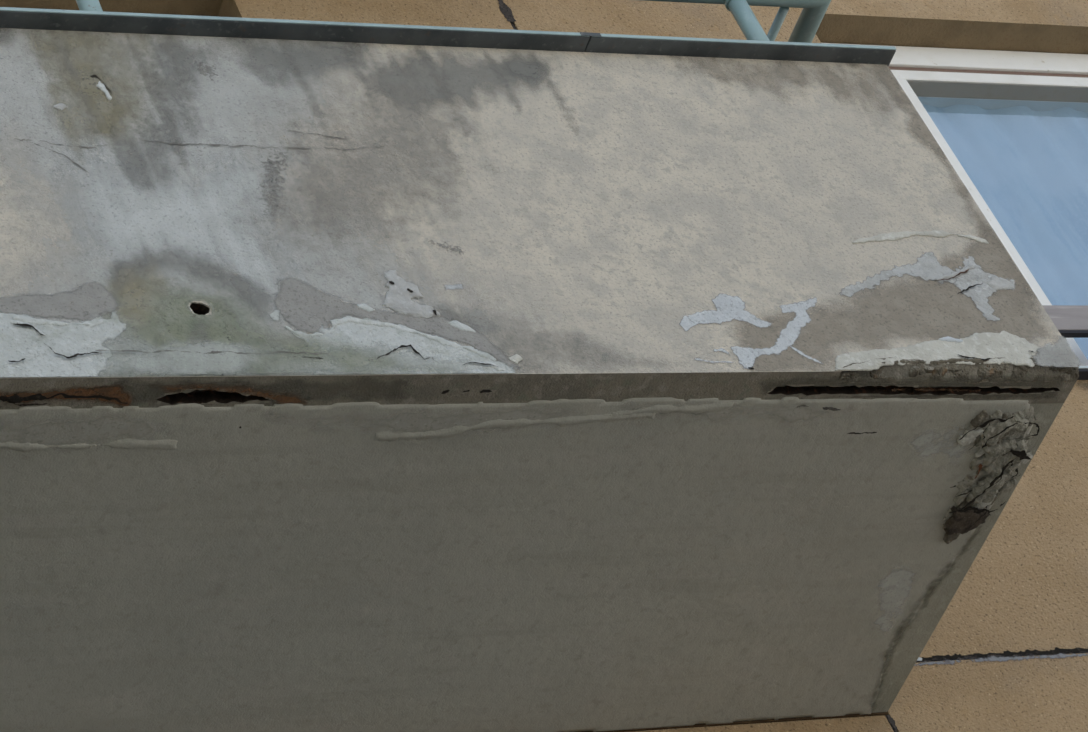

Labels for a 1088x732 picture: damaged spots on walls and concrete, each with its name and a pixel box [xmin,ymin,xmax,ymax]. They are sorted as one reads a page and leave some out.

crack [0,138,105,173]
crack [143,130,381,150]
leakage [0,28,542,402]
peeling [0,310,522,377]
peeling [680,252,1082,408]
rust [0,386,132,407]
spalling [158,389,269,404]
rust [163,385,306,404]
spalling [942,406,1040,544]